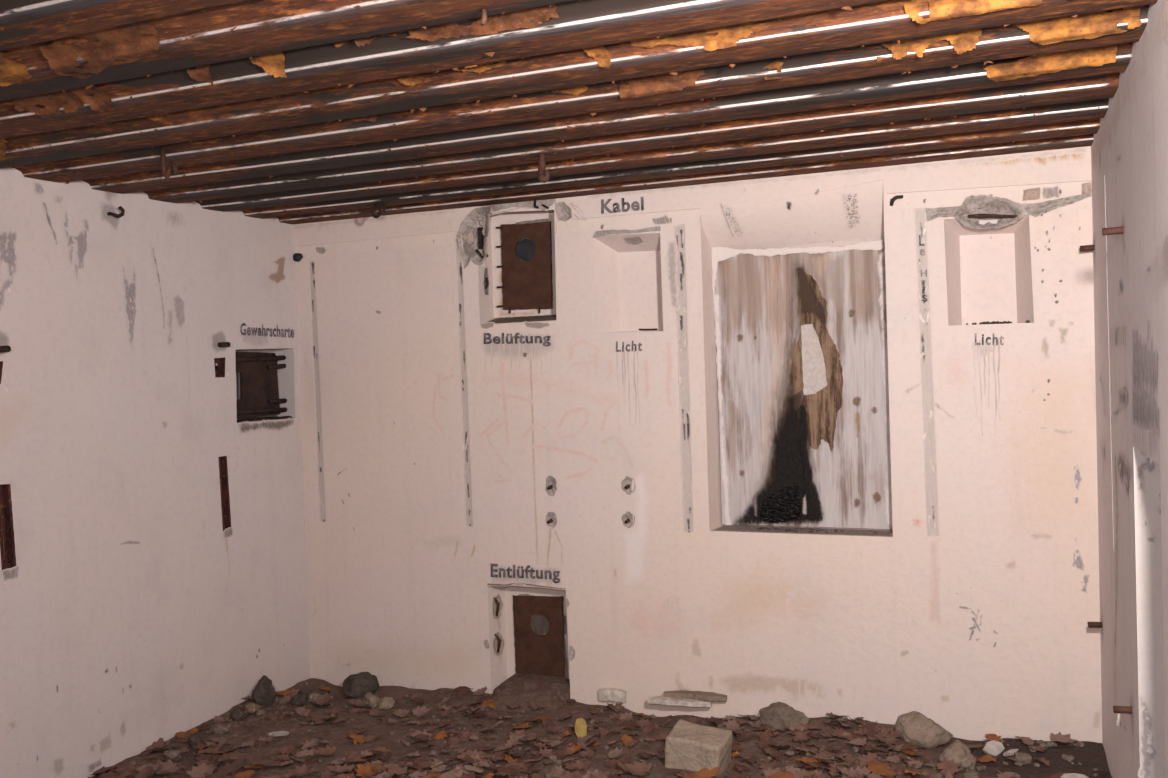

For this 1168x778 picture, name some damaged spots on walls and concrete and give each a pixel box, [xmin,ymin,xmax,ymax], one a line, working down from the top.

corrosion [0,51,33,87]
corrosion [12,22,161,116]
corrosion [248,52,287,78]
corrosion [881,0,1046,60]
corrosion [984,5,1144,82]
spalling [923,193,1091,245]
peeling [0,229,18,312]